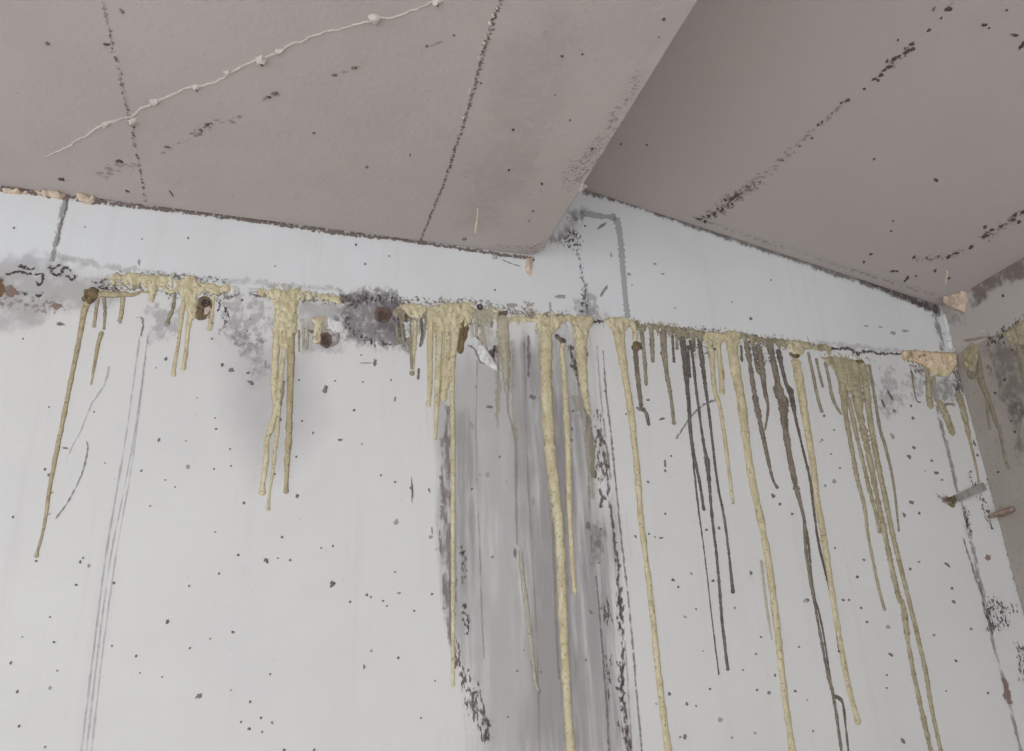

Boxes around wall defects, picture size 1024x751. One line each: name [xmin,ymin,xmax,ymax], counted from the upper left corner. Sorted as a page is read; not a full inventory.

damp [34,280,193,558]
damp [258,308,319,511]
damp [335,289,511,744]
damp [527,324,632,751]
damp [612,319,943,751]
damp [910,315,1024,529]
damp [987,596,1018,631]